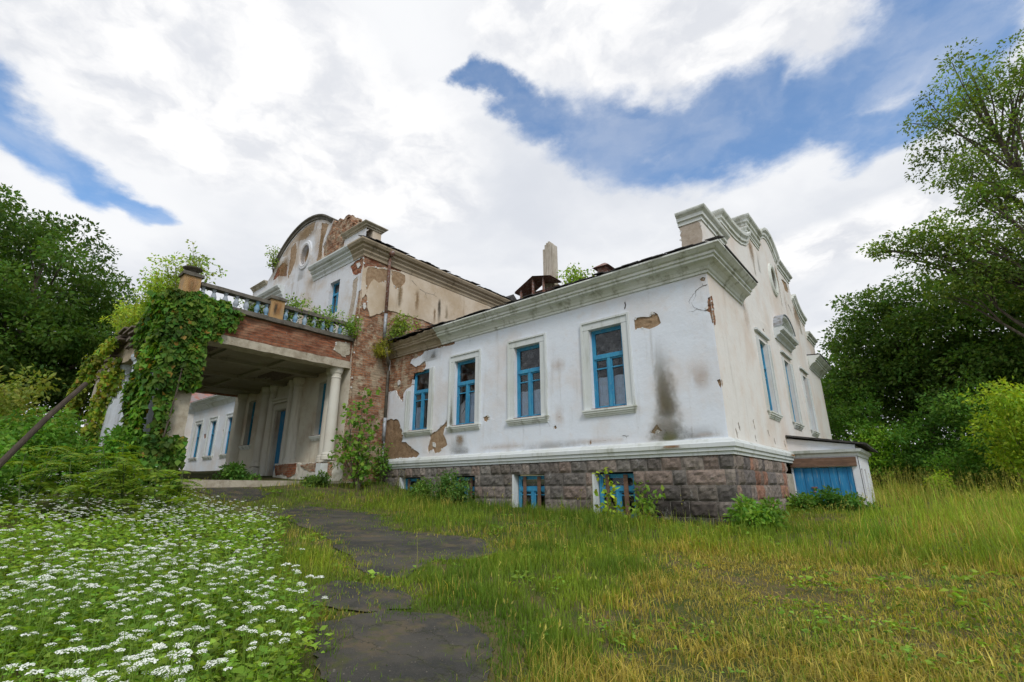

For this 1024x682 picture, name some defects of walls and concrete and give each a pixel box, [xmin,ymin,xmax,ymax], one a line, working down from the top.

spalling [273,214,362,280]
flaking render [634,311,661,330]
flaking render [275,256,455,482]